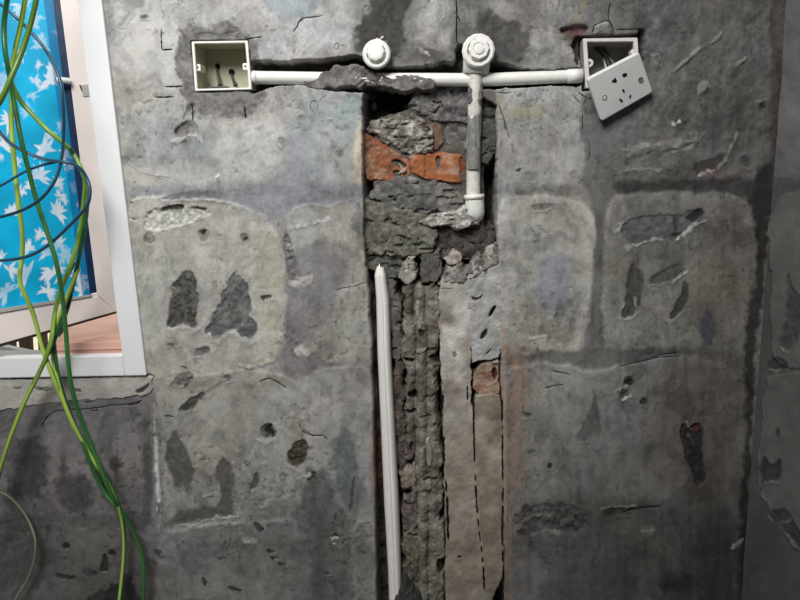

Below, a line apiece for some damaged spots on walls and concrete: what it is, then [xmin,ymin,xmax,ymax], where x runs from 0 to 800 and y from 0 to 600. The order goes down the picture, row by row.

flaking render [140,173,245,248]
peeling [611,207,707,253]
peeling [163,266,277,414]
crack [621,353,679,366]
peeling [616,262,691,325]
peeling [766,272,800,375]
flaking render [282,428,321,479]
flaking render [678,419,709,501]
flaking render [757,454,800,552]